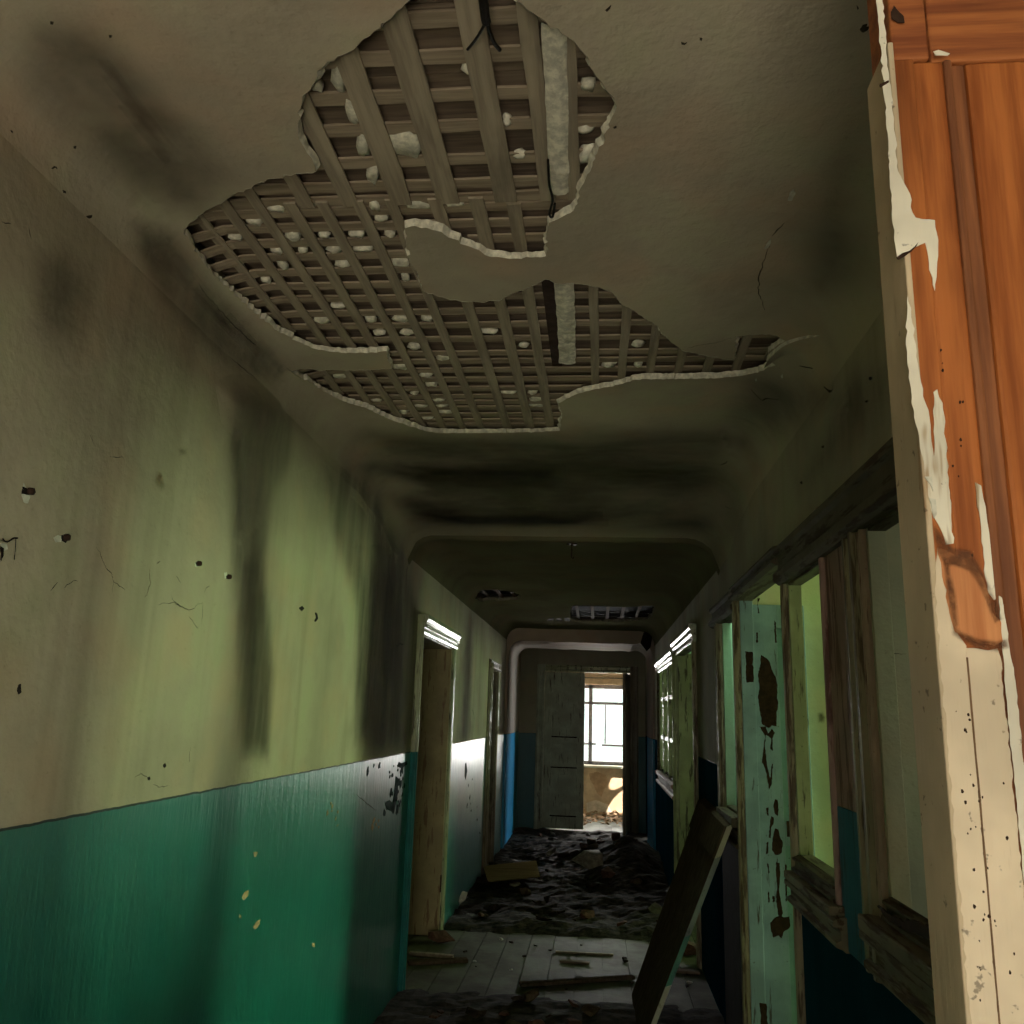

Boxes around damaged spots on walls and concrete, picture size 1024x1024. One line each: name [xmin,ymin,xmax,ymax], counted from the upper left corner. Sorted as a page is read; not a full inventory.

spalling [184,0,785,433]
peeling [367,761,408,831]
peeling [758,655,790,938]